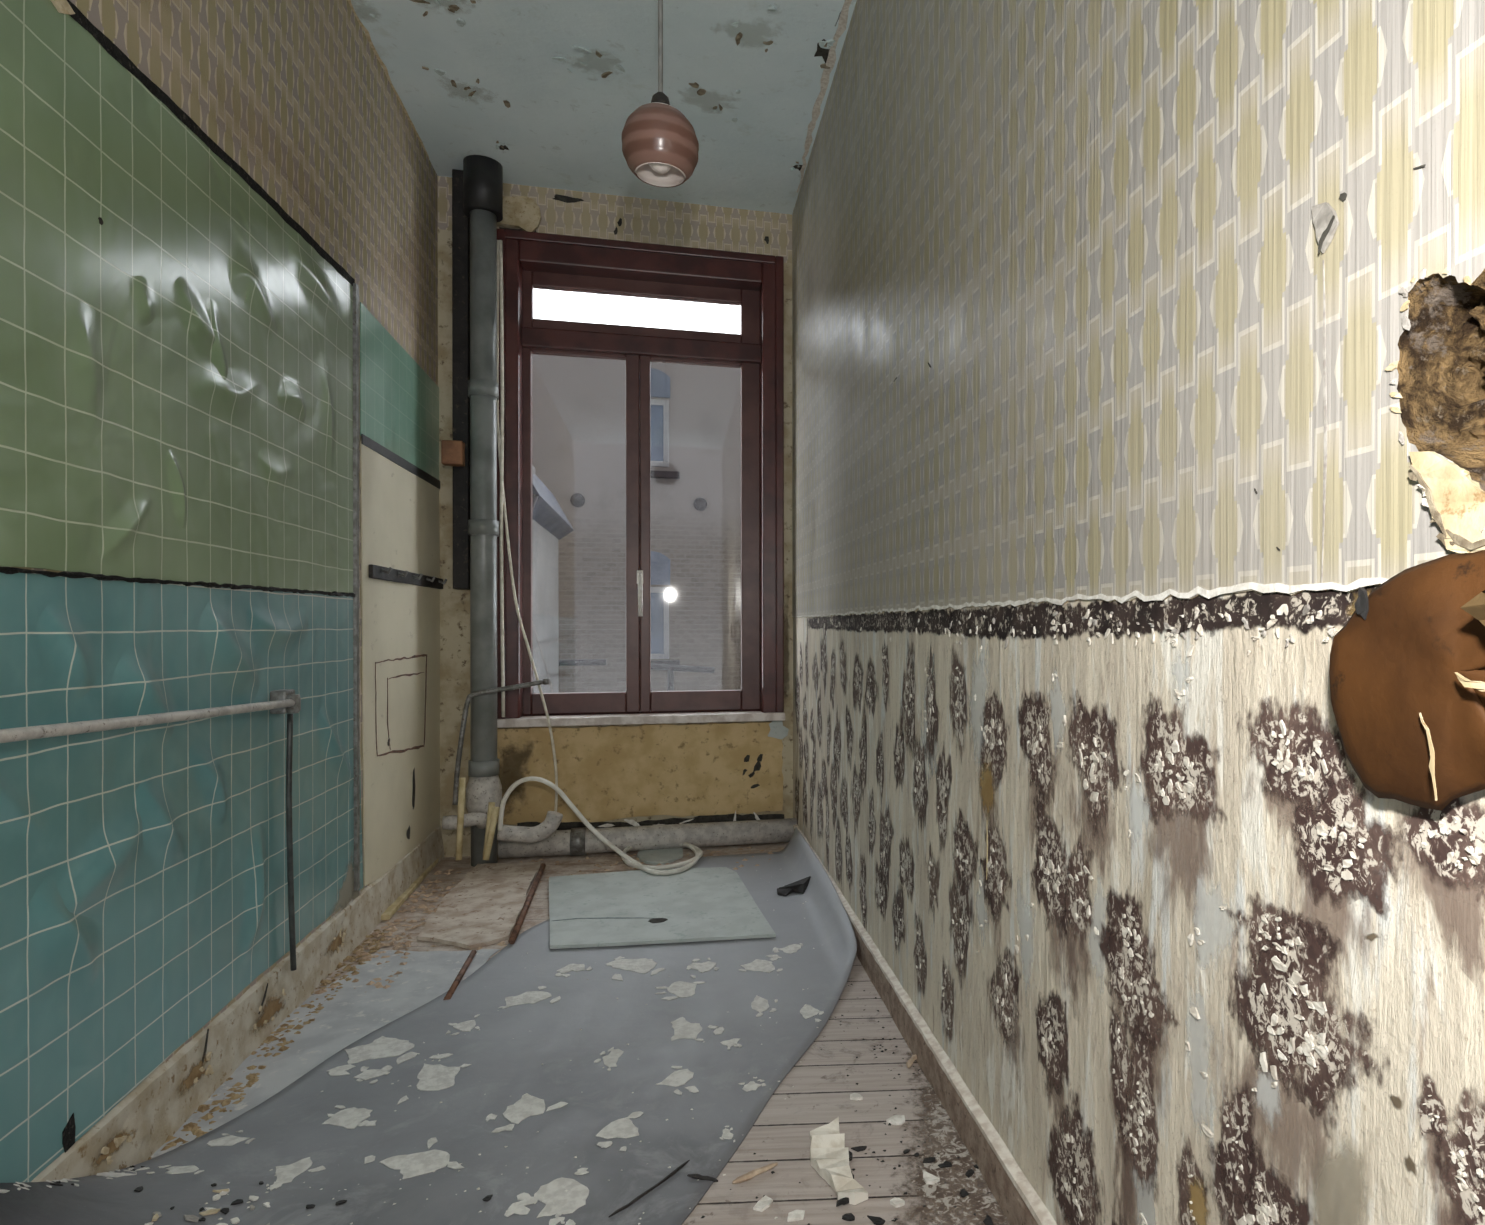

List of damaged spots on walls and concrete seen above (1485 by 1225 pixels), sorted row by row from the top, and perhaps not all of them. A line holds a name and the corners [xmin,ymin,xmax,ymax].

spalling [1384,267,1485,553]
damp [499,746,531,801]
peeling [1027,673,1107,802]
peeling [944,604,1338,758]
peeling [1123,740,1194,839]
peeling [1271,720,1328,781]
peeling [1419,816,1482,869]
peeling [1039,856,1154,1018]
peeling [1251,913,1329,1119]
spalling [842,1197,905,1225]
peeling [1112,1069,1155,1225]
peeling [1185,996,1278,1225]